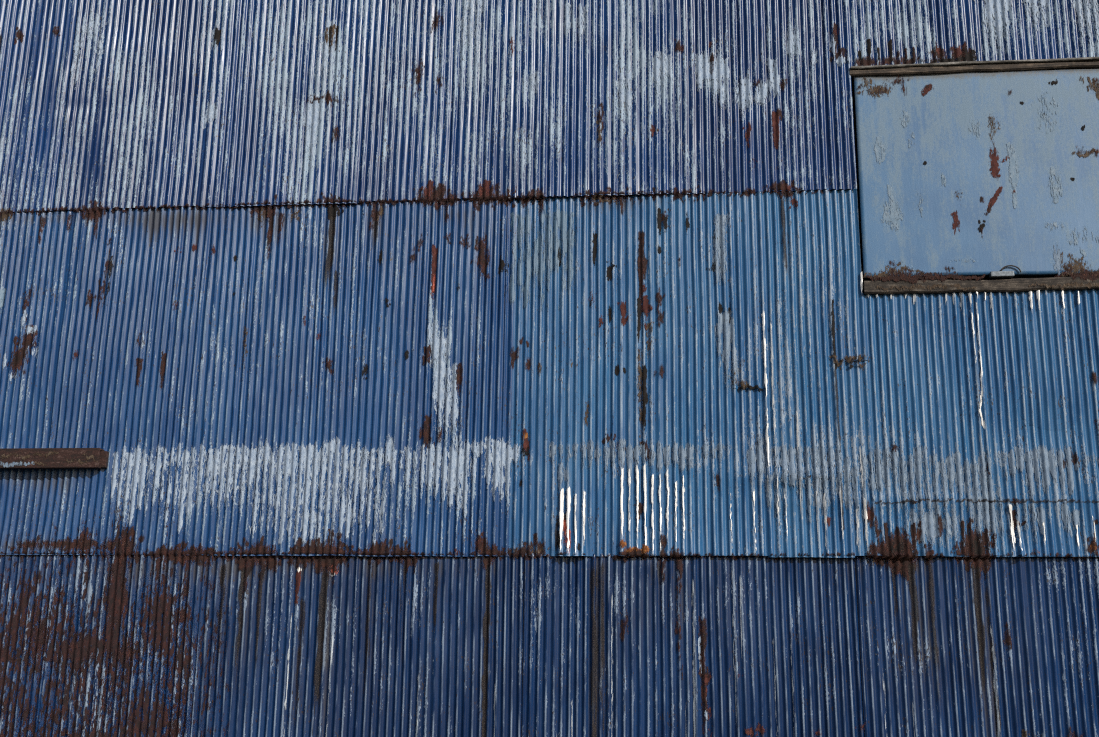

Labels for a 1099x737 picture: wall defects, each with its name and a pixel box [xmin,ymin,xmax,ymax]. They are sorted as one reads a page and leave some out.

rust [1080,76,1099,100]
rust [978,116,1016,232]
rust [951,192,963,234]
rust [864,261,985,292]
rust [2,289,38,381]
rust [598,231,665,461]
rust [455,362,463,392]
peeling [0,451,98,467]
peeling [111,320,520,547]
rust [419,415,442,449]
rust [522,429,530,461]
rust [0,501,1099,737]